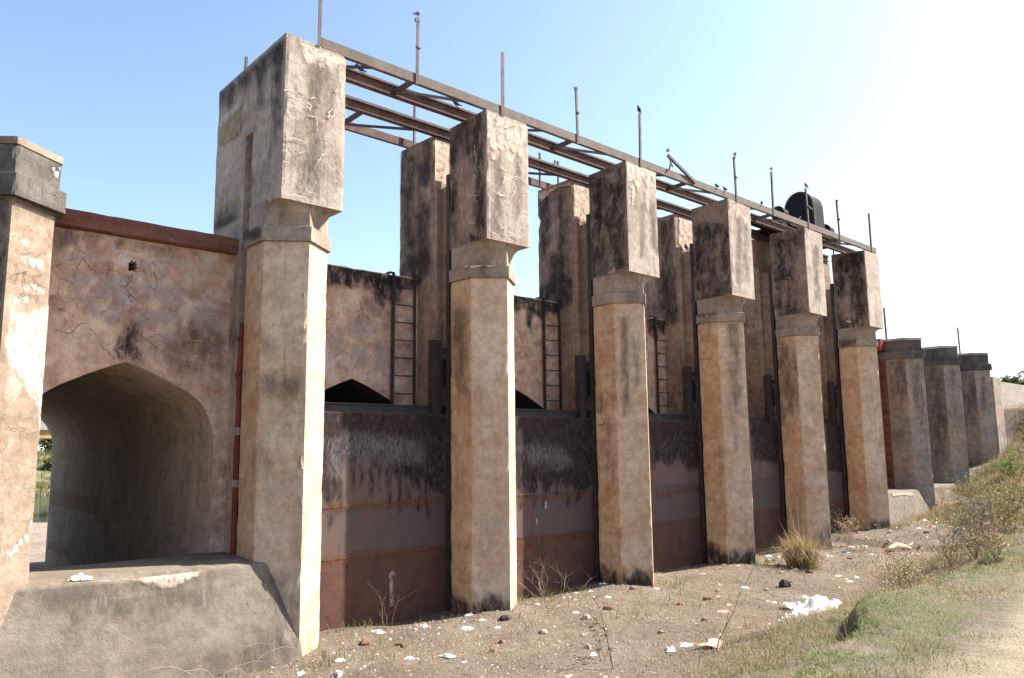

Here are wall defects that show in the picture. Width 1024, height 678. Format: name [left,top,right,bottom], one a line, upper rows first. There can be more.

crack [16,249,214,360]
leakage [321,412,445,525]
leakage [515,417,592,510]
leakage [649,420,699,470]
leakage [750,423,779,464]